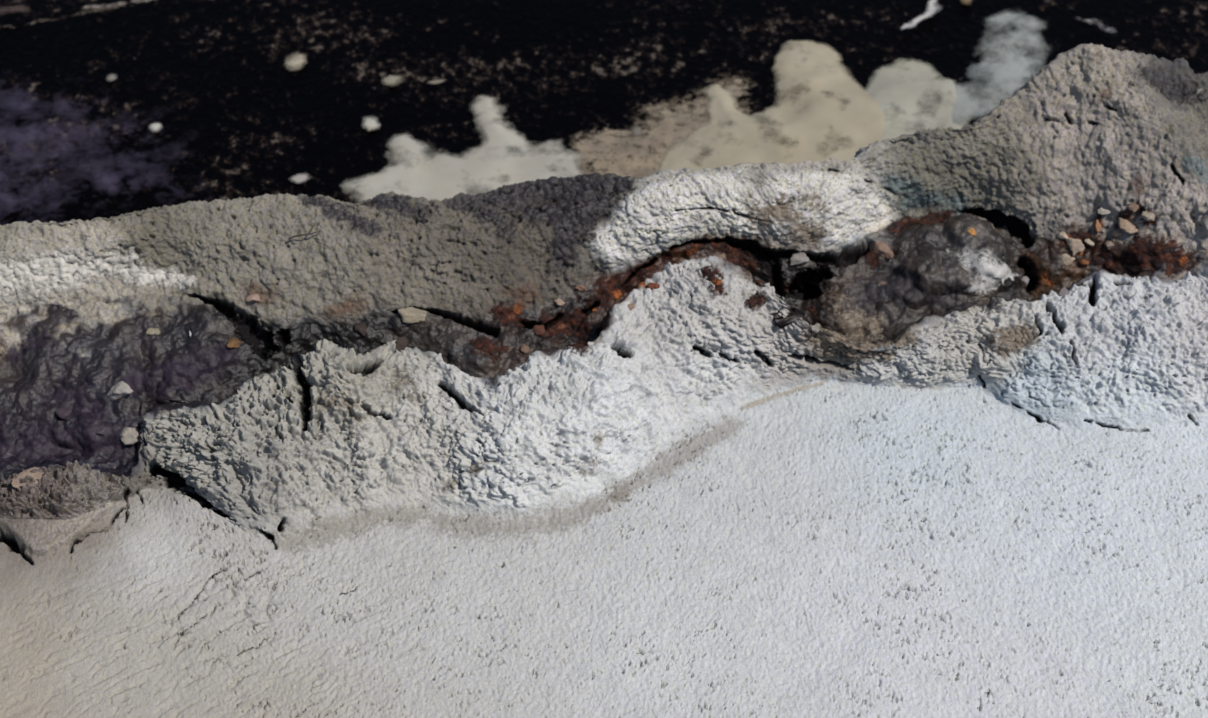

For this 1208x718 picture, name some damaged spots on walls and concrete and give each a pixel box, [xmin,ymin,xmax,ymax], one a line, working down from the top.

rust [888,209,951,236]
rust [1059,200,1204,277]
leakage [0,237,197,310]
rust [489,234,766,356]
rust [1018,248,1060,298]
leakage [2,321,54,367]
leakage [120,339,239,407]
rust [470,336,509,364]
leakage [0,374,141,469]
crack [0,536,32,564]
crack [70,464,229,554]
crack [264,520,283,543]